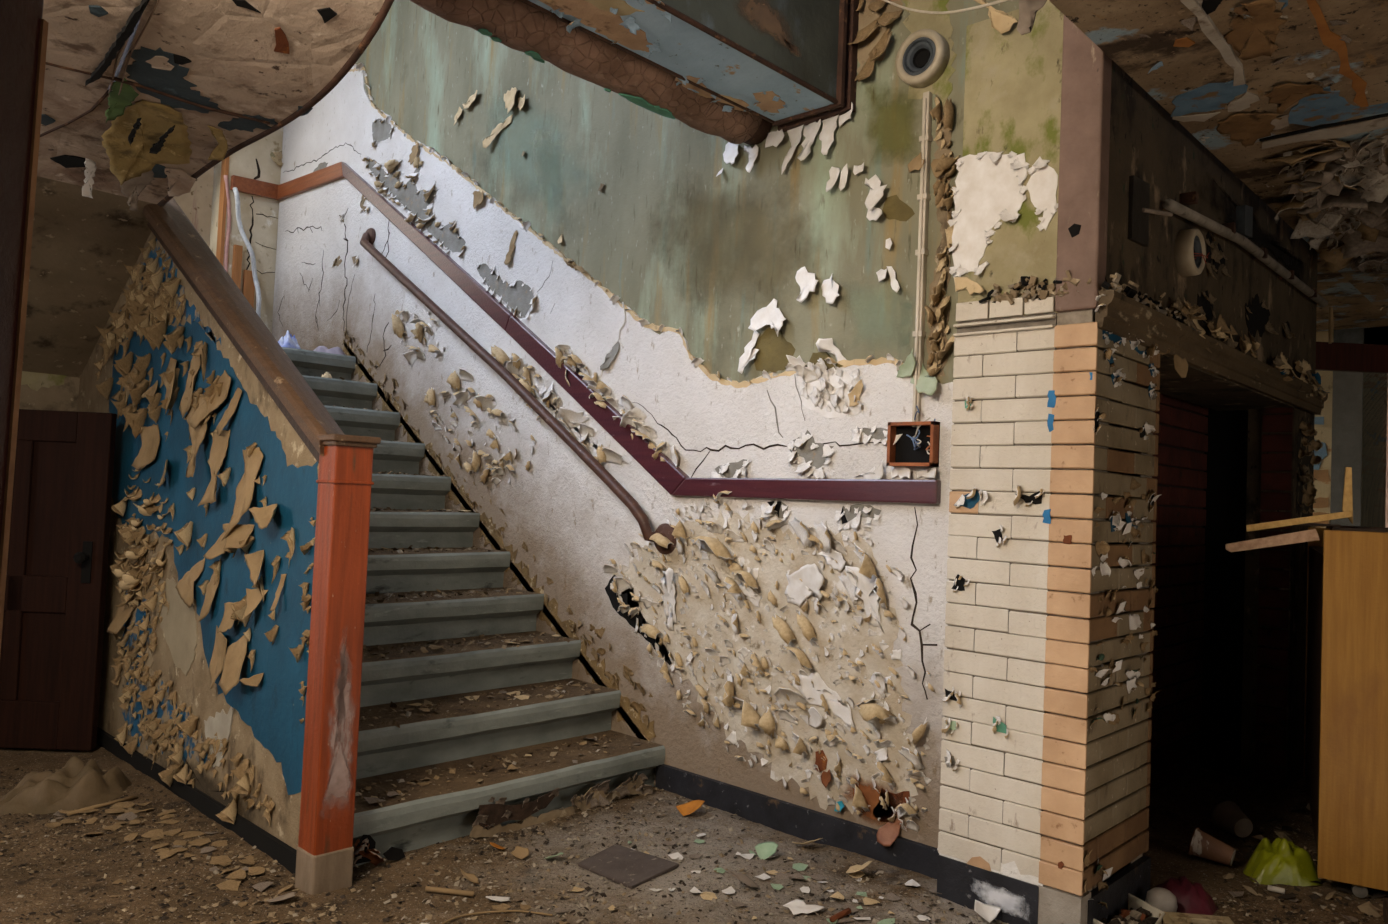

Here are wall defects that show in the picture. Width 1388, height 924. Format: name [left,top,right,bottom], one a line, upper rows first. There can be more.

peeling [126,46,278,132]
peeling [847,0,903,82]
flaking render [349,63,989,479]
peeling [1262,133,1388,273]
peeling [93,236,318,826]
peeling [344,328,678,537]
crack [632,374,887,478]
crack [910,507,937,700]
peeling [951,574,970,593]
peeling [1013,485,1045,507]
peeling [1089,478,1160,726]
peeling [1296,415,1329,527]